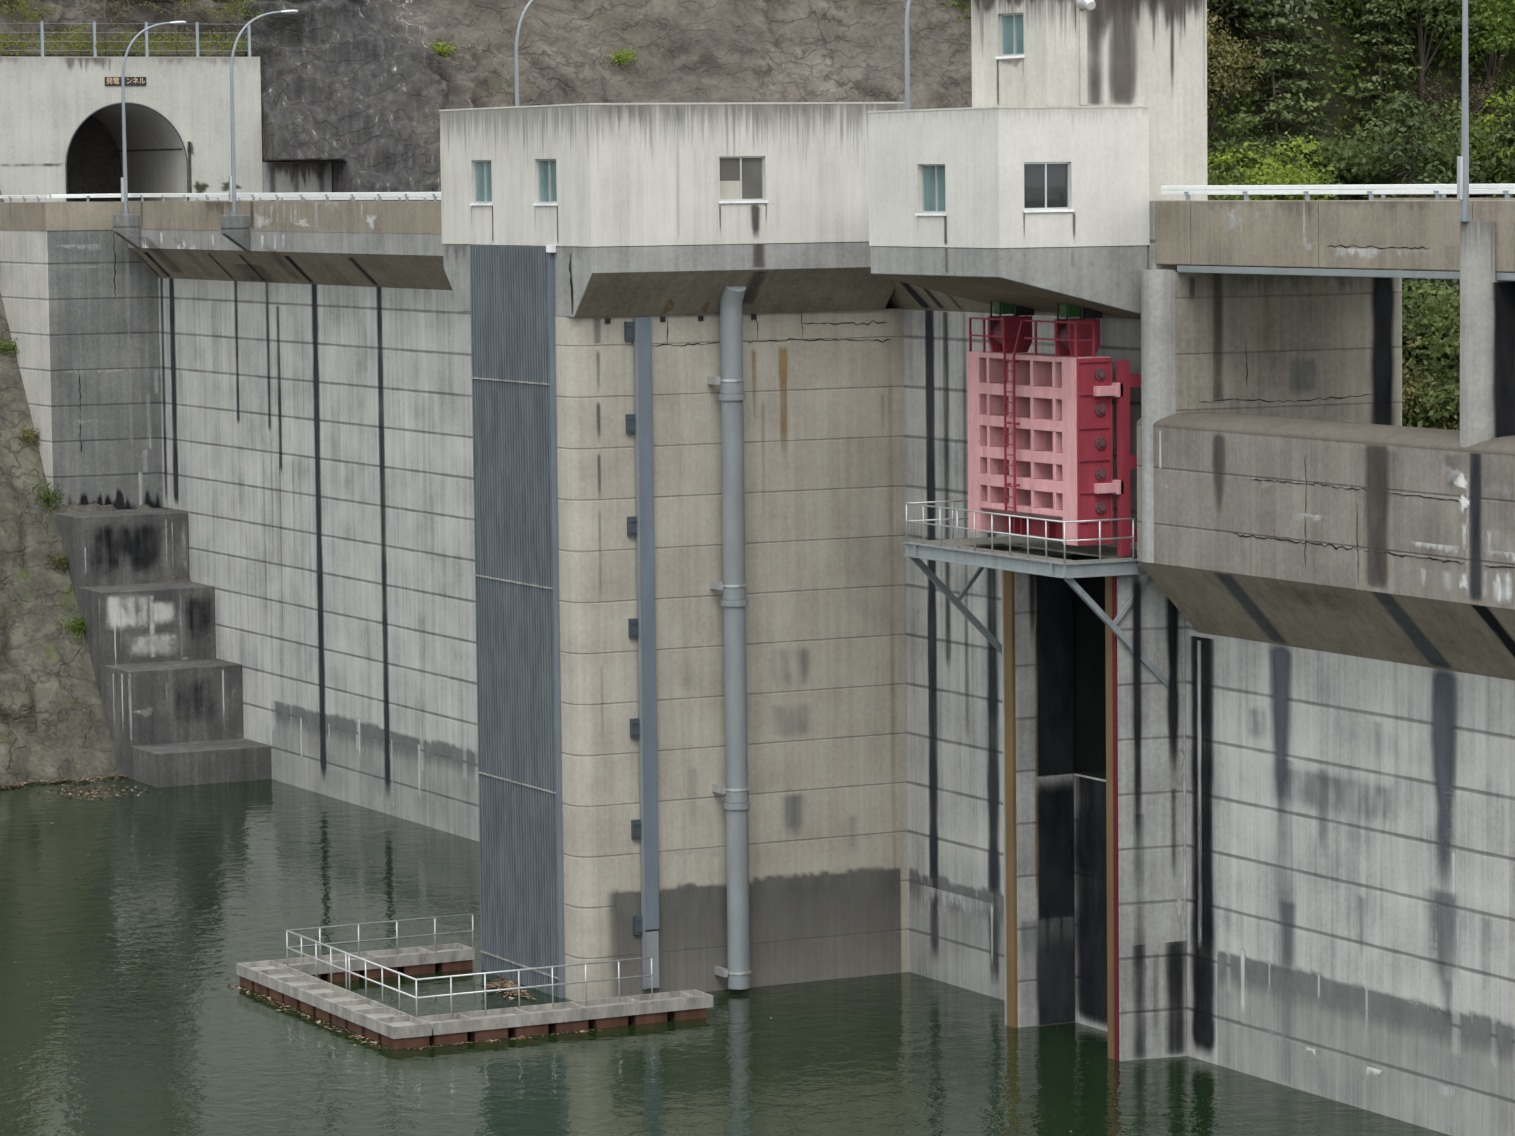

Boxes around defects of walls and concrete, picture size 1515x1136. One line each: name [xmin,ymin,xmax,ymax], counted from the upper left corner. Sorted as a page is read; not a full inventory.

damp [1060,0,1199,103]
damp [79,232,282,509]
damp [251,162,475,788]
crack [652,313,892,347]
rust [779,349,787,432]
damp [900,282,948,540]
crack [1327,243,1429,251]
damp [1416,453,1515,657]
damp [749,560,1004,979]
damp [1133,578,1142,829]
damp [1167,573,1514,1057]
damp [1366,445,1456,968]